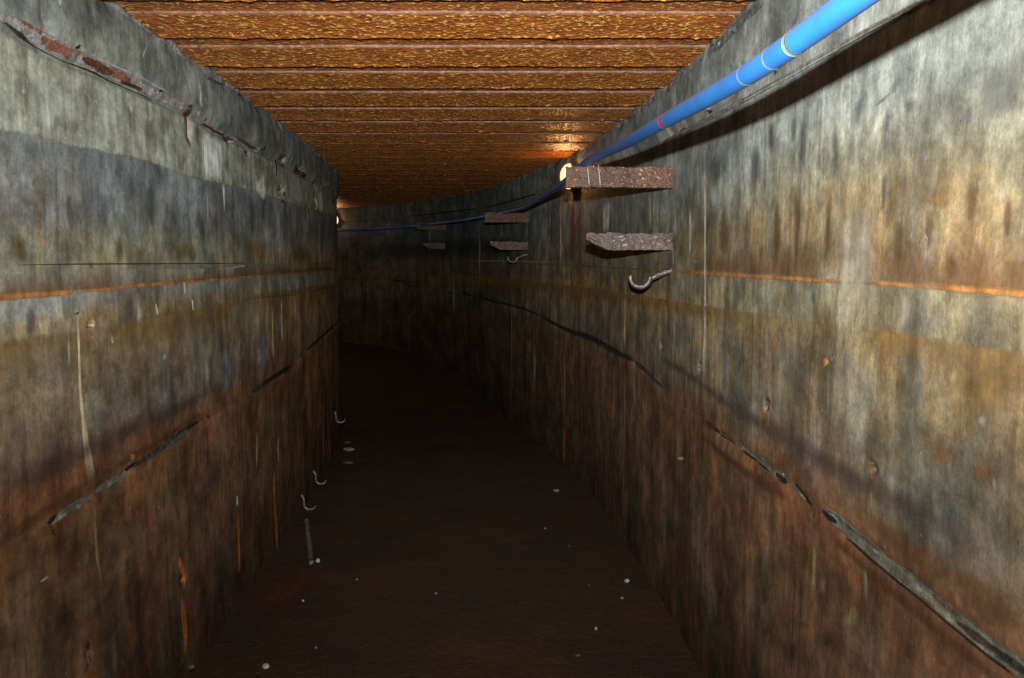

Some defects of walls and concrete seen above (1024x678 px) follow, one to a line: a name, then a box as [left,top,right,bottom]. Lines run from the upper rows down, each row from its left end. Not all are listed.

leakage [793,123,805,158]
leakage [672,160,1024,365]
crack [45,323,337,535]
crack [448,292,1024,678]